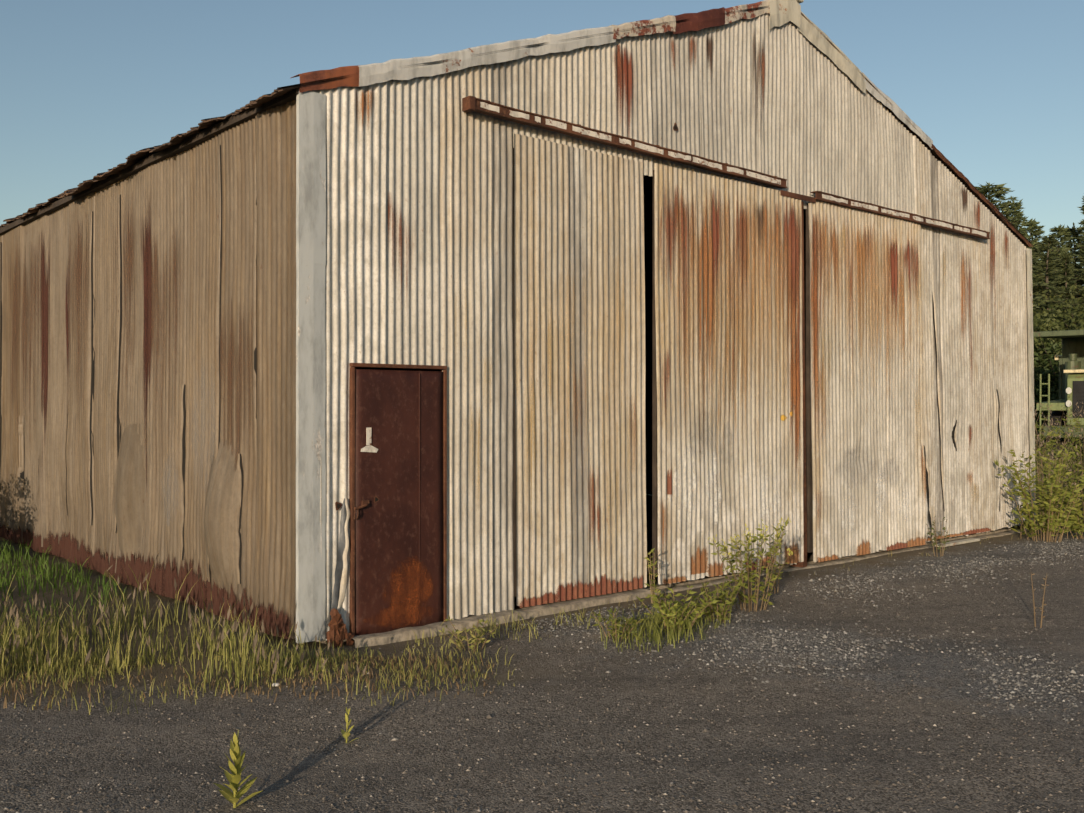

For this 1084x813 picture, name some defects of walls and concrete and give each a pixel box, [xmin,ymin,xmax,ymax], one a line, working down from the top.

corrosion [617,46,633,132]
corrosion [388,199,407,286]
corrosion [661,194,921,462]
corrosion [961,257,972,345]
corrosion [662,453,722,545]
corrosion [377,559,432,626]
corrosion [520,574,643,608]
corrosion [663,548,723,585]
corrosion [746,541,800,571]
corrosion [856,541,871,556]
corrosion [887,528,991,551]